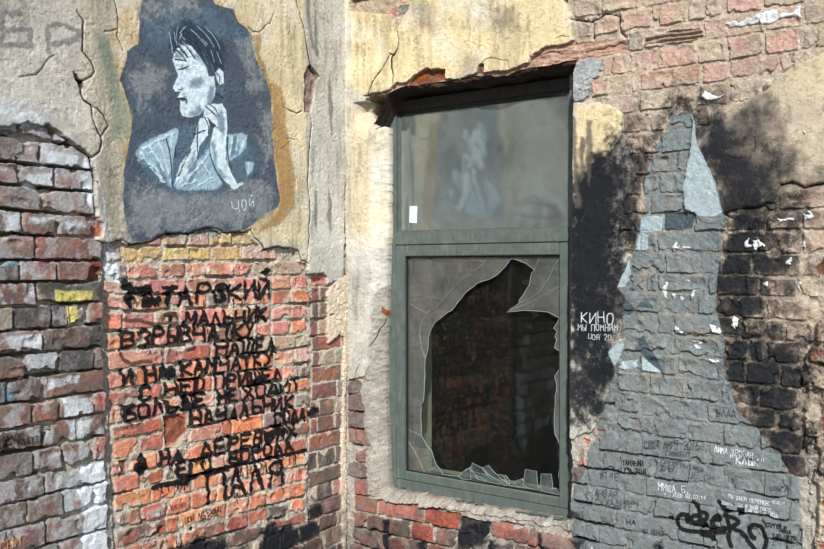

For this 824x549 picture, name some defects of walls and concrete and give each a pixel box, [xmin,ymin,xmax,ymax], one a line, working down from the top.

spalling [350,0,392,15]
peeling [726,5,802,27]
spalling [645,27,705,44]
crack [368,33,399,96]
spalling [86,216,104,237]
spalling [86,265,101,280]